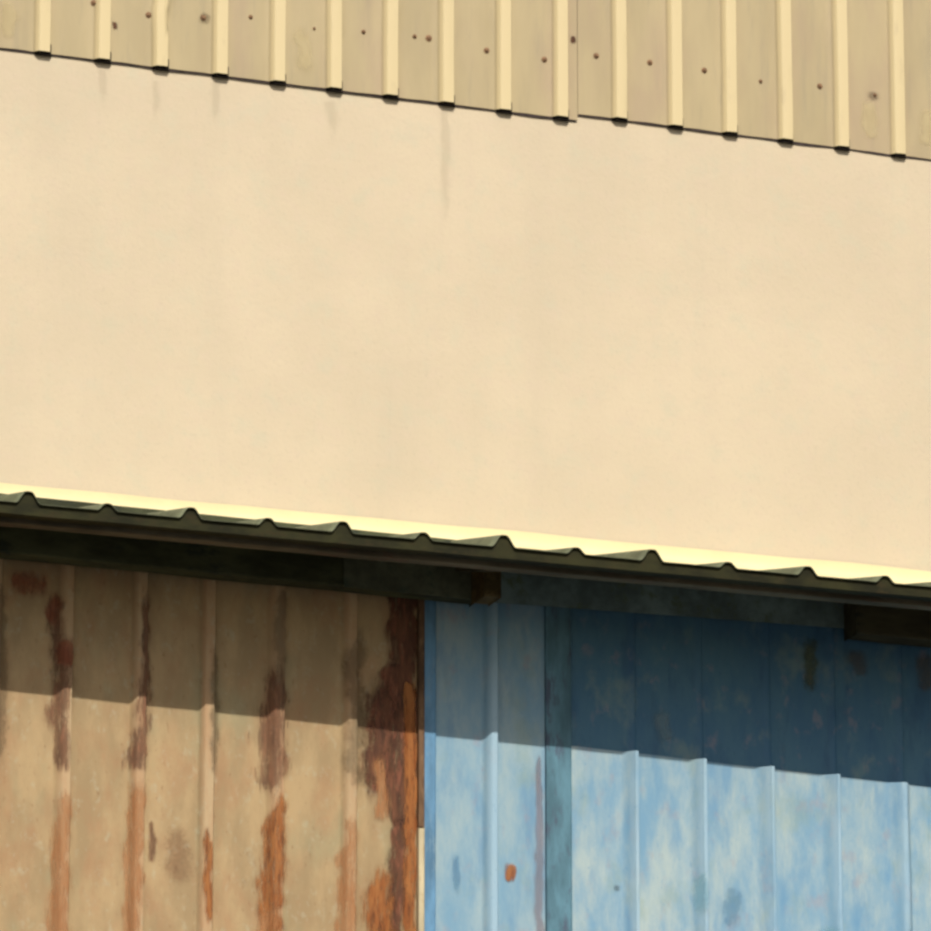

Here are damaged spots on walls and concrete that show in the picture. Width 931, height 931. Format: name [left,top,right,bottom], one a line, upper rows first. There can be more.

rust [46,597,73,770]
rust [47,794,72,931]
rust [127,596,152,770]
rust [124,789,156,931]
rust [202,829,213,921]
rust [256,671,287,931]
rust [335,597,417,931]
rust [505,864,516,882]